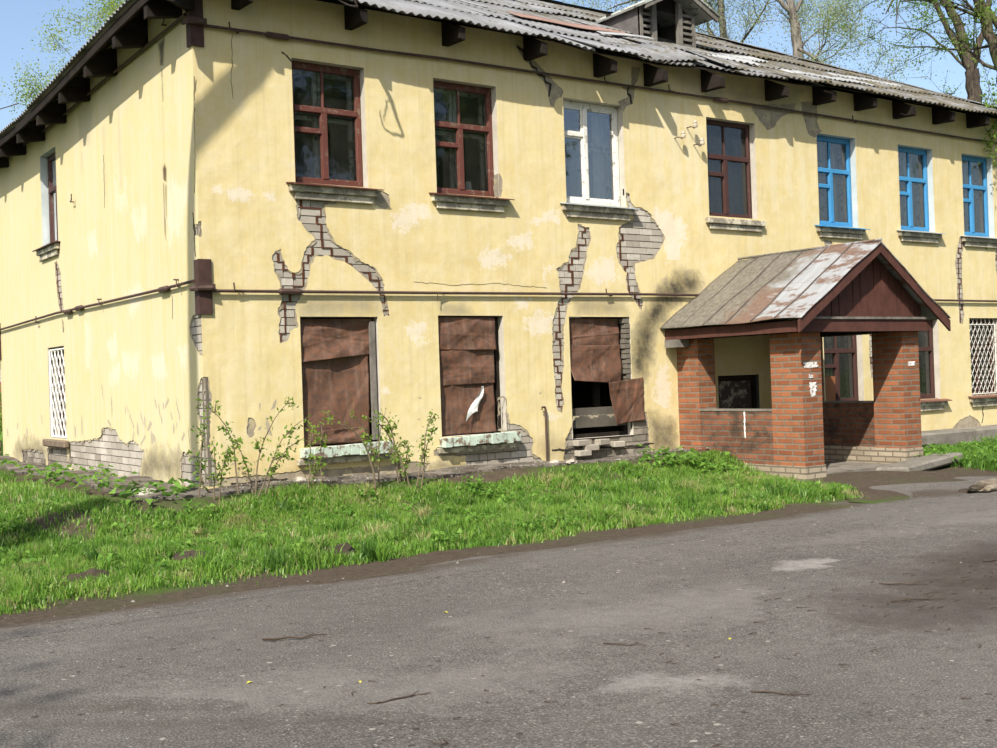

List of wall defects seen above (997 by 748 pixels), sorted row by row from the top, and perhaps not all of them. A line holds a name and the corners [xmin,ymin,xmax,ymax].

spalling [515,45,563,107]
spalling [751,101,821,138]
spalling [55,261,64,330]
peeling [124,274,146,325]
spalling [272,199,389,343]
peeling [473,189,690,461]
peeling [22,311,541,487]